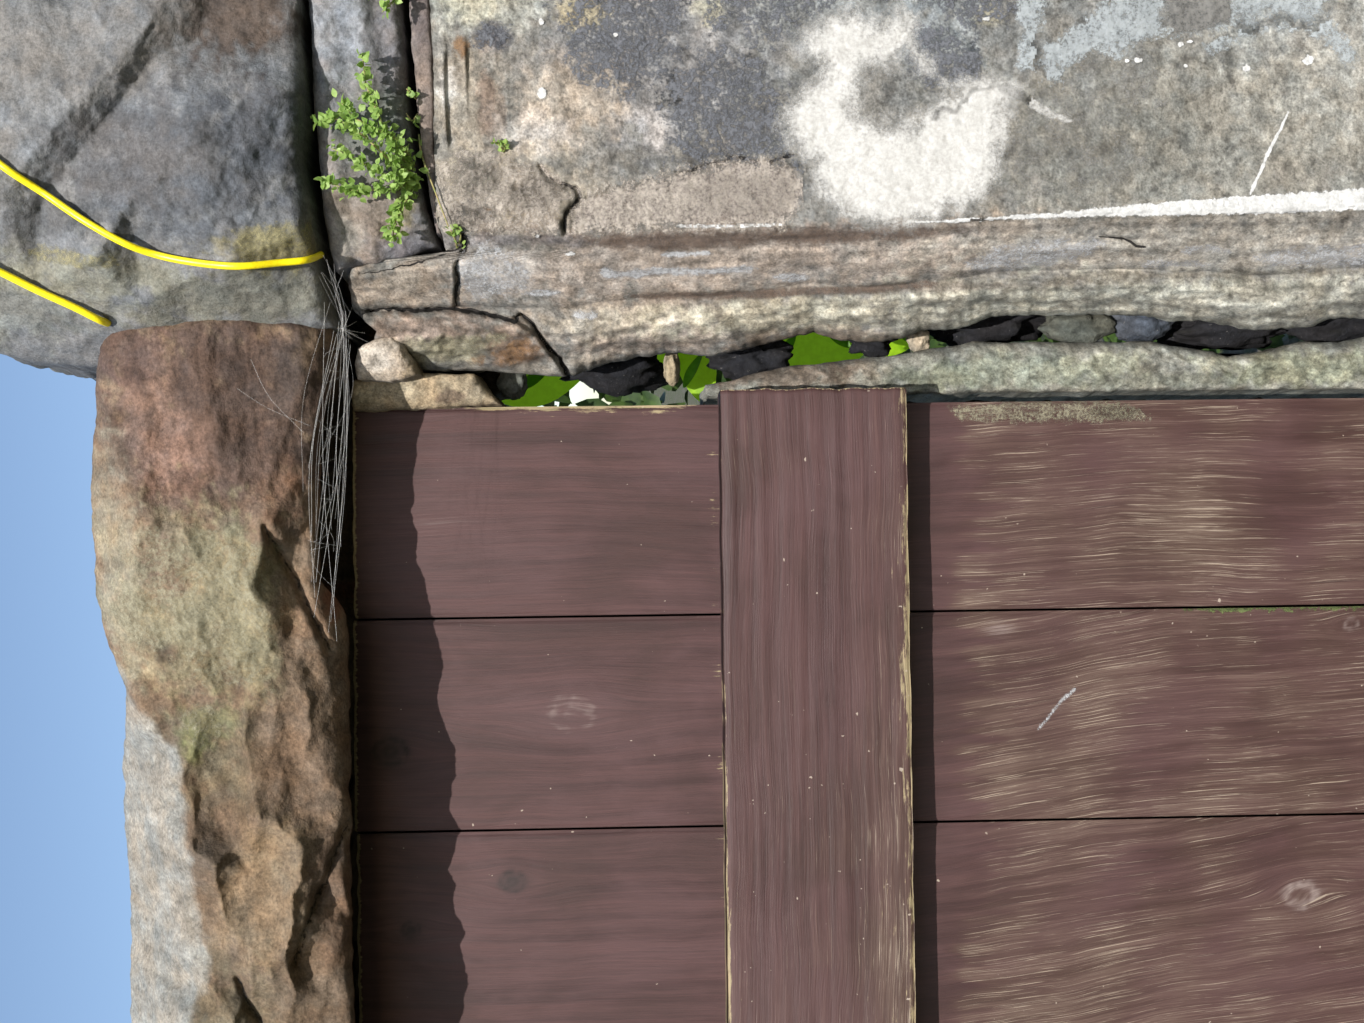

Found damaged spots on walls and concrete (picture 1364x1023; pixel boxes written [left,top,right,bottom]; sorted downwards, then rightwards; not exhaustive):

damp [587,0,1072,278]
crack [540,166,582,235]
damp [631,273,935,299]